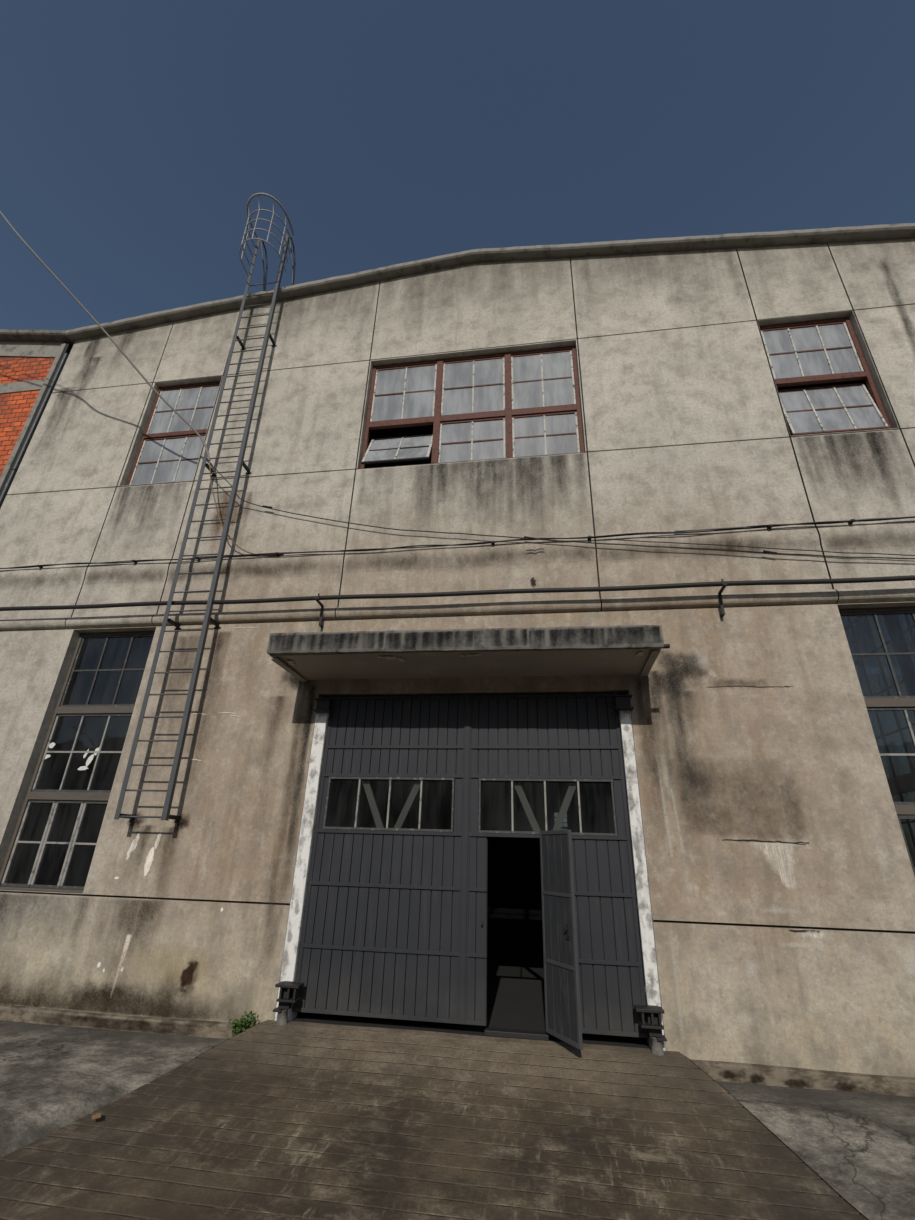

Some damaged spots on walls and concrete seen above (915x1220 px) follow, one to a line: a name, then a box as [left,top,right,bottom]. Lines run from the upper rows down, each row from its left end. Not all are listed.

leakage [830,432,886,470]
leakage [638,655,715,732]
flaking render [126,829,162,879]
flaking render [97,935,131,983]
leakage [0,988,191,1018]